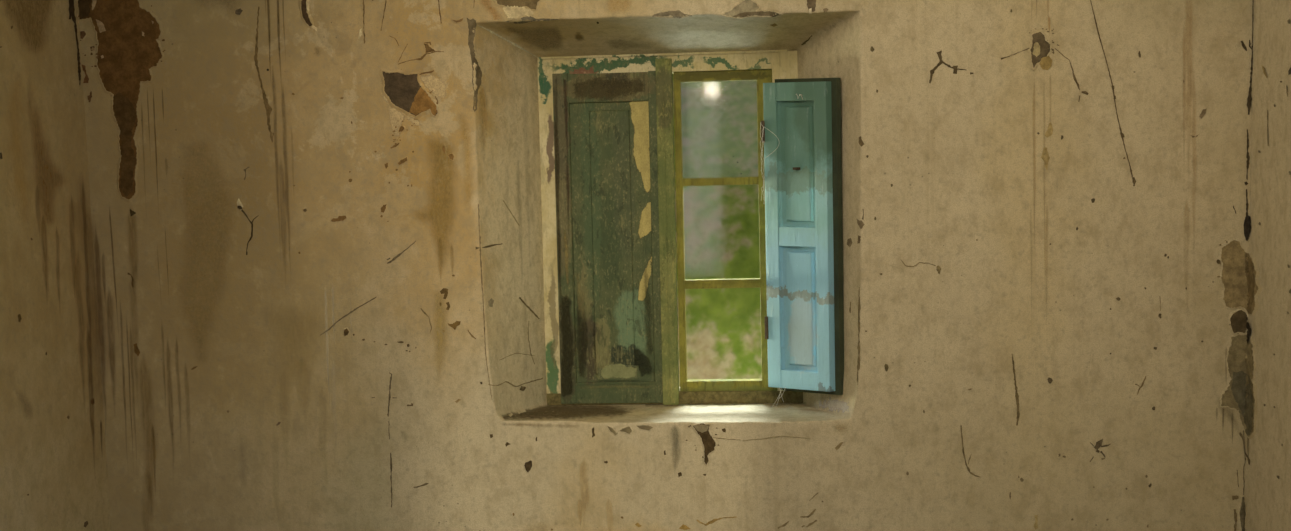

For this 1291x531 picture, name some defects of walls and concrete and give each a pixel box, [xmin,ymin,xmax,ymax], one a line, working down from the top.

peeling [74,0,165,216]
flaking render [374,68,445,184]
flaking render [493,0,560,25]
crack [929,0,1136,186]
flaking render [1028,28,1059,72]
peeling [1217,238,1262,316]
peeling [1218,333,1275,440]
flaking render [686,422,740,476]